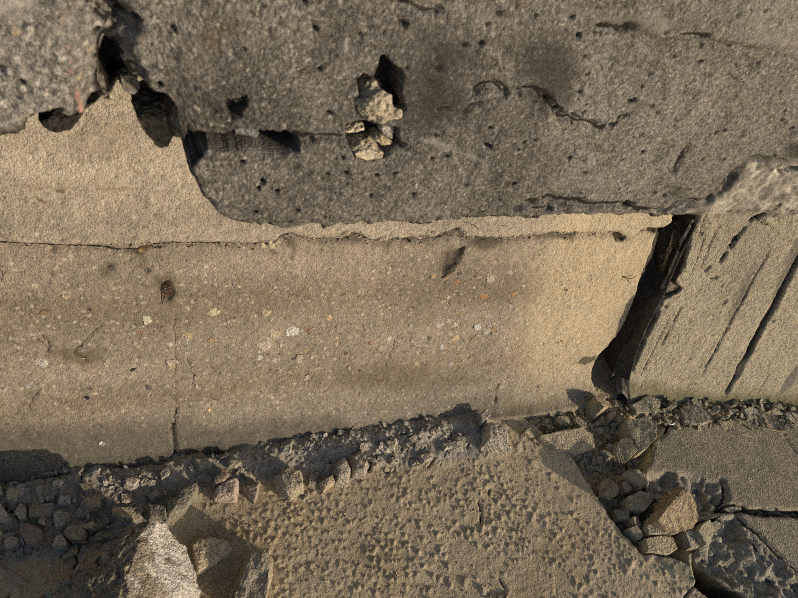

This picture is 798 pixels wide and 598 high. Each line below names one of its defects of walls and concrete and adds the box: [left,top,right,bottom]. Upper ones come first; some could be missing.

crack [464,80,622,130]
crack [343,221,513,243]
crack [0,233,324,301]
spalling [135,309,156,348]
crack [171,323,194,453]
spalling [162,327,221,389]
spalling [237,312,361,389]
spalling [368,271,537,383]
crack [714,482,798,573]